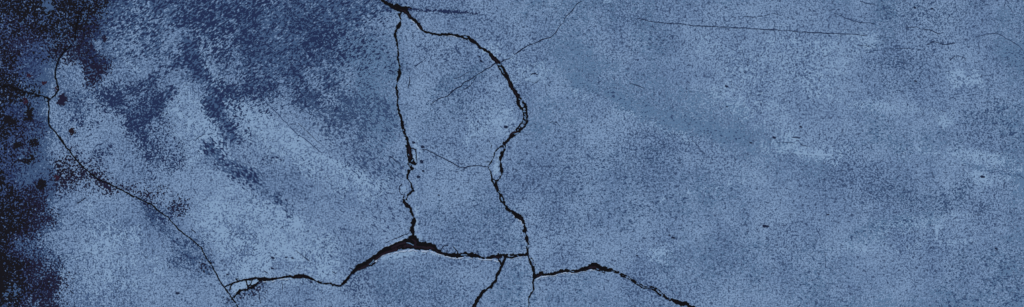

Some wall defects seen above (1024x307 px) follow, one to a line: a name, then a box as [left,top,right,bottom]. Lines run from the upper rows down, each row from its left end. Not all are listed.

crack [0,0,695,307]